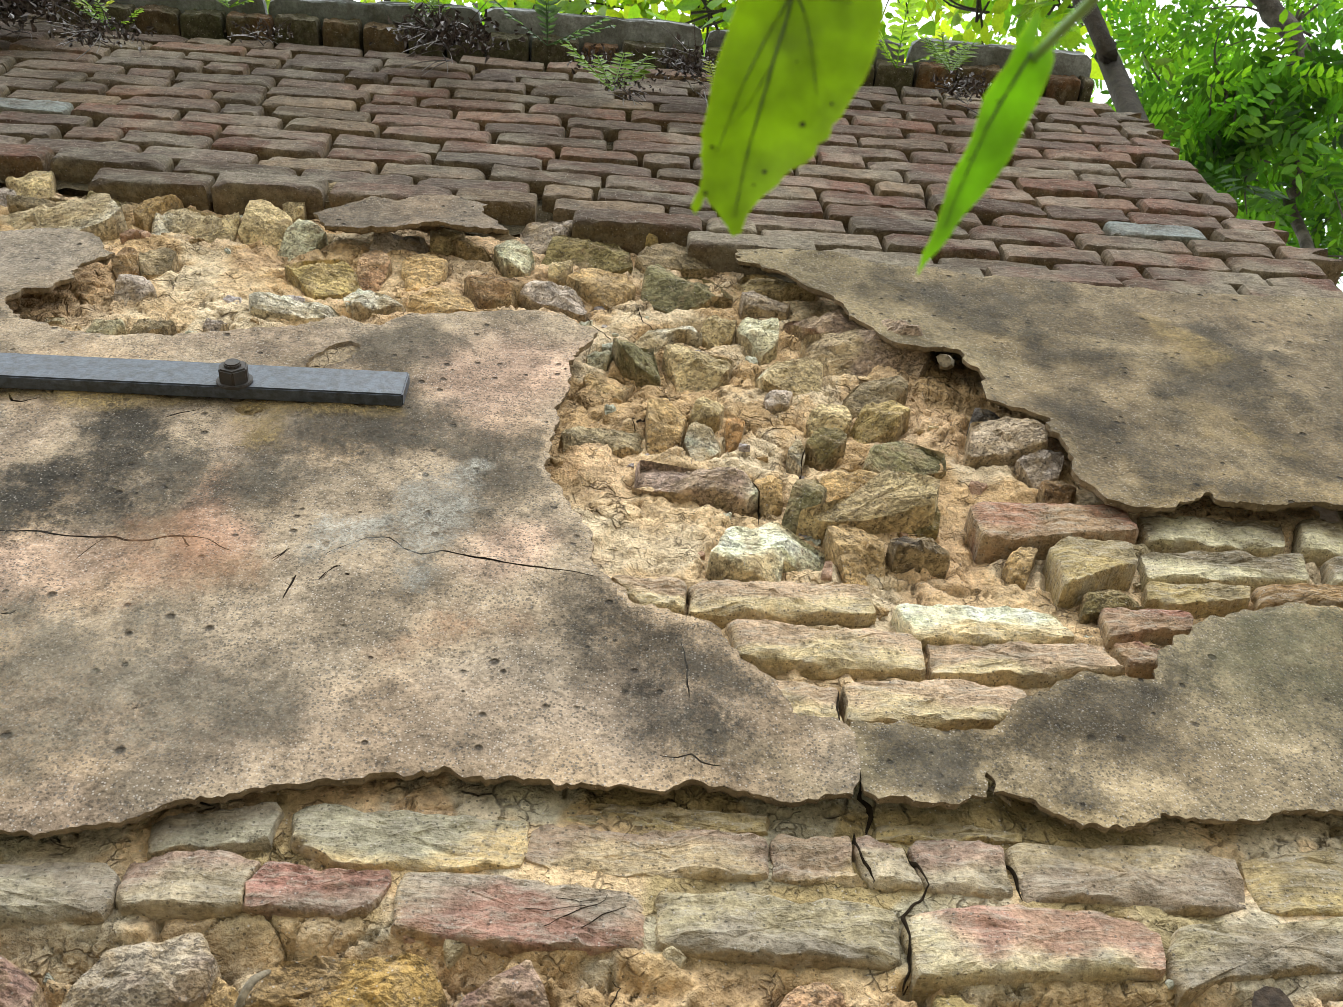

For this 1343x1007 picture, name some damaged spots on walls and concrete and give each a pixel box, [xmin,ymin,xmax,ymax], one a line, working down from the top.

water stain [339,317,467,372]
water stain [0,383,577,589]
spalling [0,170,1343,732]
spalling [0,766,1343,1007]
crack [852,782,875,882]
crack [900,848,930,996]